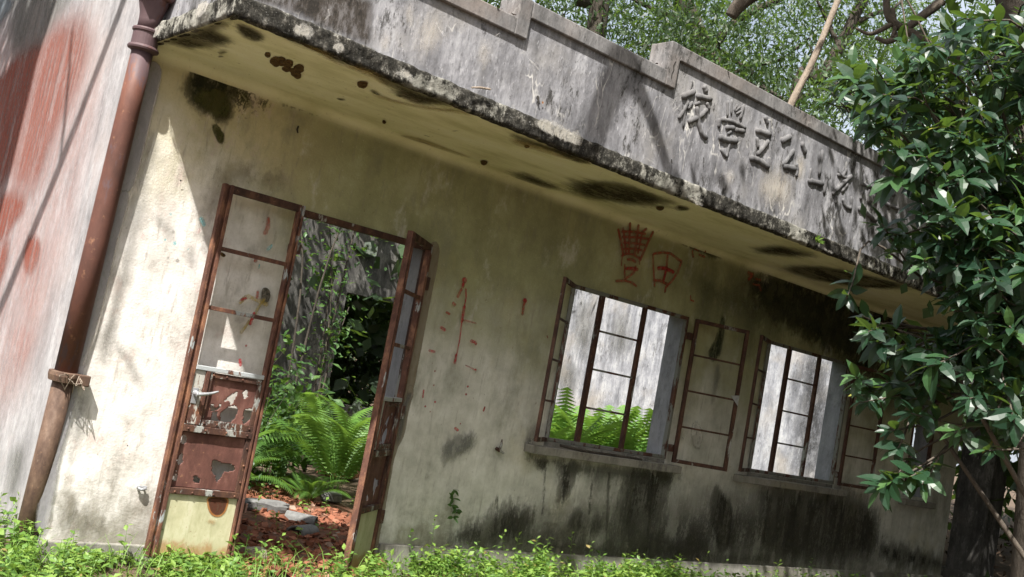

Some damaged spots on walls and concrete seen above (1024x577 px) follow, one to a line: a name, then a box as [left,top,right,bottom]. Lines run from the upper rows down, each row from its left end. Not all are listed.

leakage [185,72,267,143]
leakage [516,174,554,188]
leakage [572,182,689,211]
leakage [444,435,472,458]
leakage [559,467,575,499]
leakage [457,472,940,566]